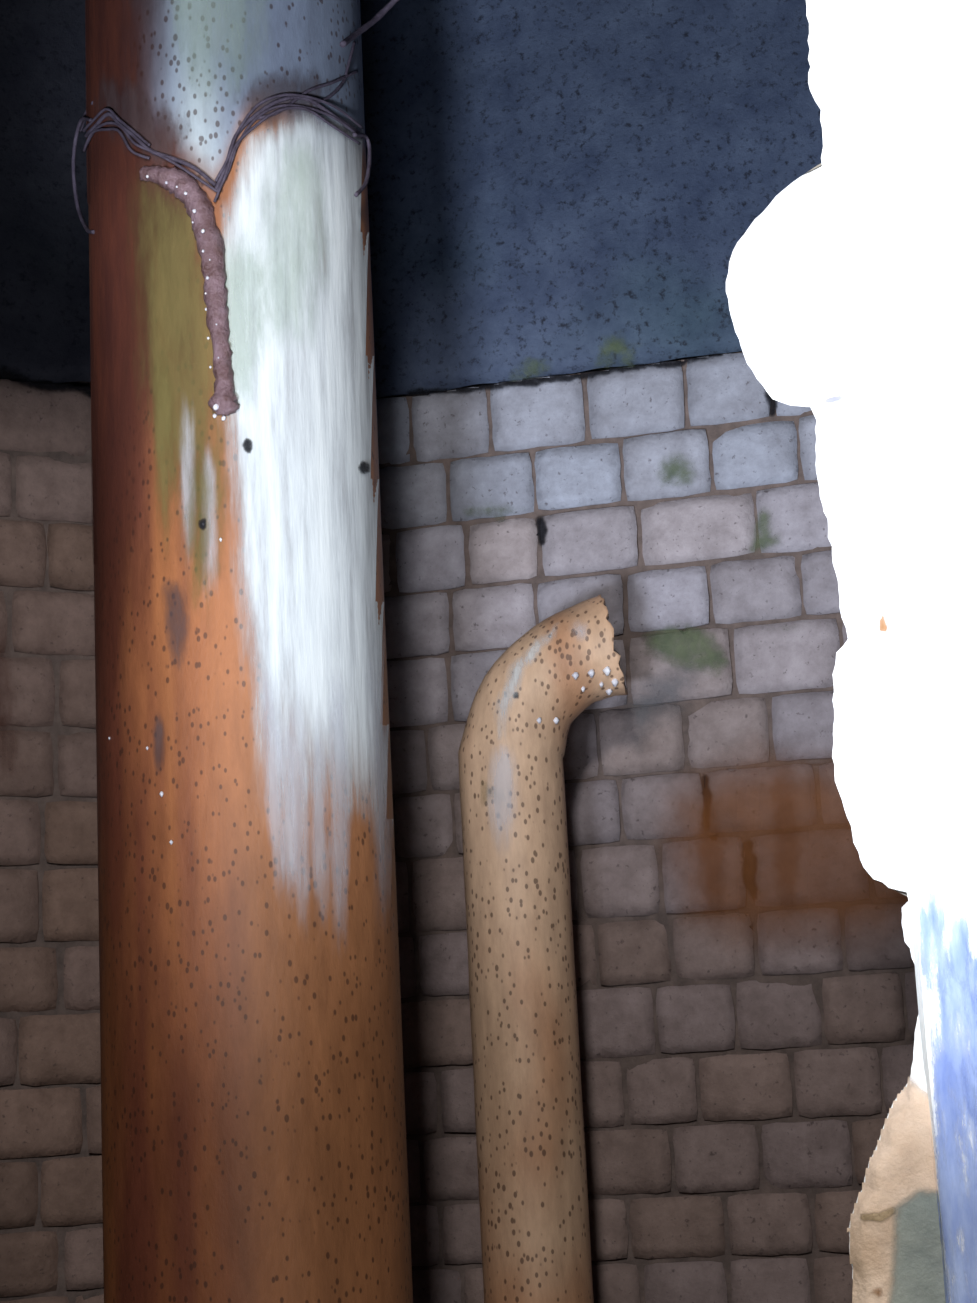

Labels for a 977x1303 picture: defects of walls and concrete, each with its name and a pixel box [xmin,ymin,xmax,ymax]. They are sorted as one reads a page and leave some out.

corrosion [85,0,141,556]
damp [225,117,389,785]
peeling [581,666,619,695]
peeling [847,893,977,1303]